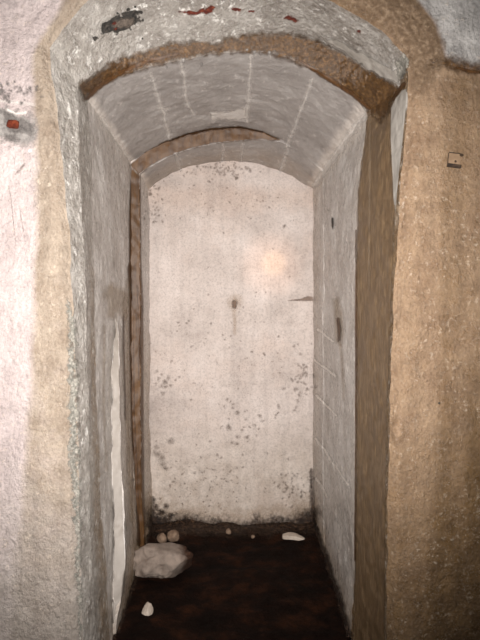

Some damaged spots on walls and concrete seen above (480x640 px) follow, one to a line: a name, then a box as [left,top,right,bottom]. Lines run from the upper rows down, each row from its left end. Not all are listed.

spalling [93,6,144,41]
leakage [80,32,398,640]